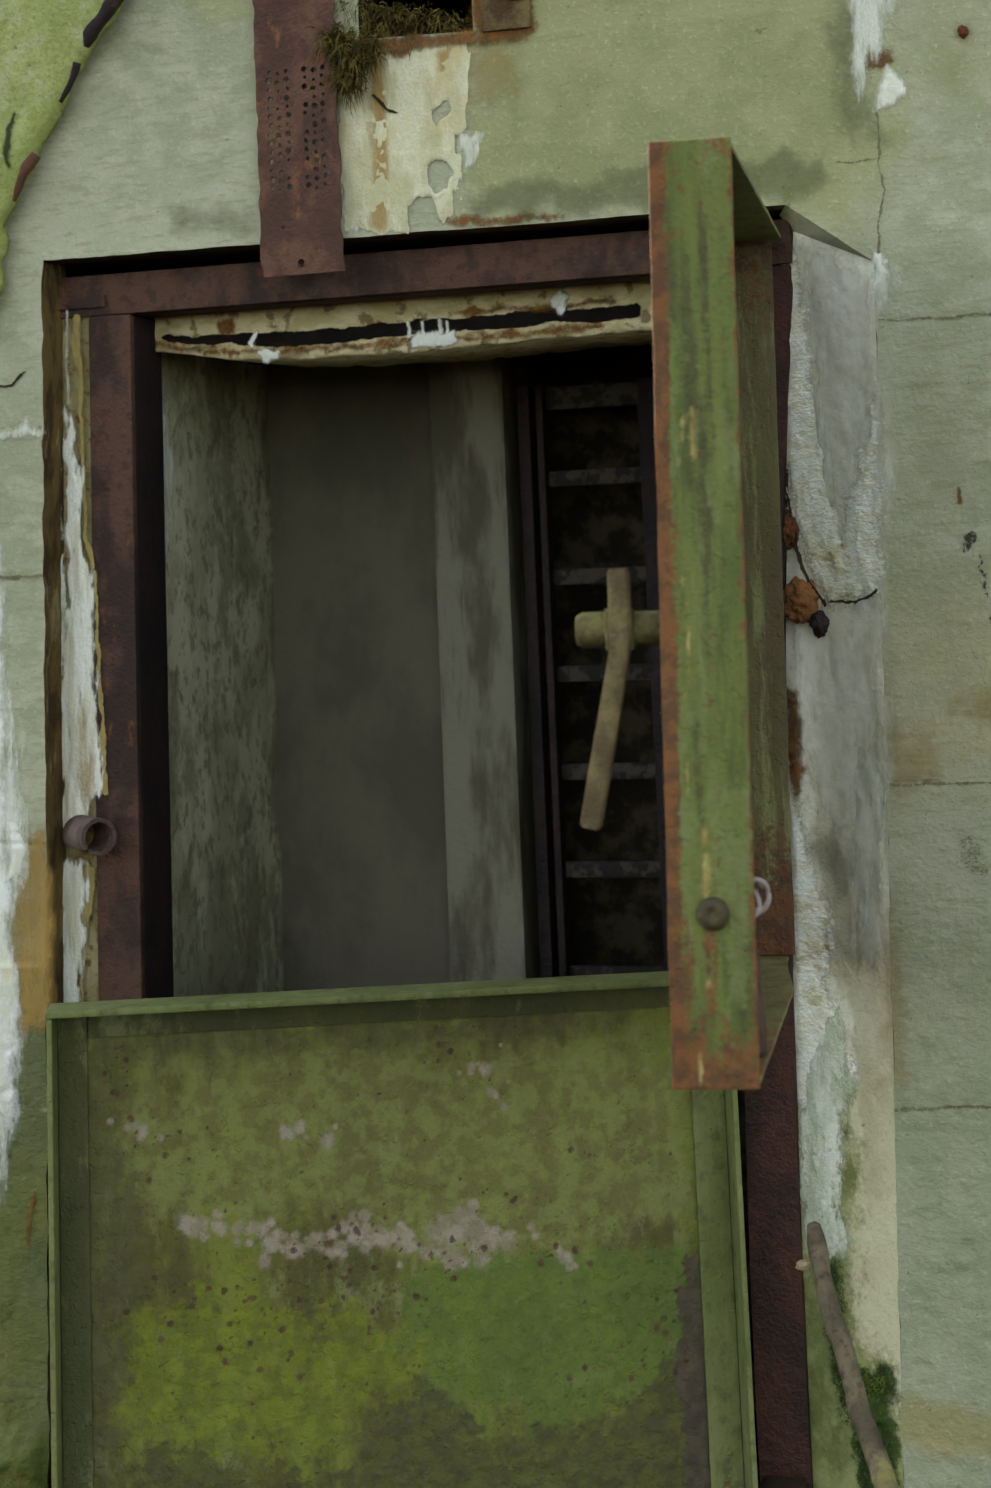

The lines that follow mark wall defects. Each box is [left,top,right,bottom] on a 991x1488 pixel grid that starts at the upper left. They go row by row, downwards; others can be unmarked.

water stain [851,0,906,109]
peeling [338,43,480,235]
crack [837,109,885,254]
rust [217,319,234,334]
water stain [0,420,41,440]
rust [72,314,109,795]
water stain [773,250,894,1258]
water stain [0,653,28,1177]
rust [80,861,96,1002]